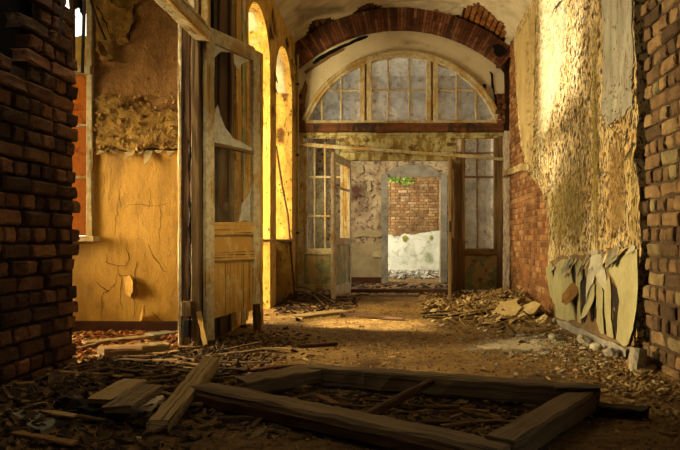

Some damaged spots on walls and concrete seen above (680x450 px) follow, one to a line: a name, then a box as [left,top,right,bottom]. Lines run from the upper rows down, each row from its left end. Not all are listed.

peeling [93,0,142,63]
spalling [306,17,336,34]
spalling [353,3,384,14]
peeling [92,93,178,165]
peeling [433,0,639,350]
crack [102,175,168,270]
crack [97,248,160,320]